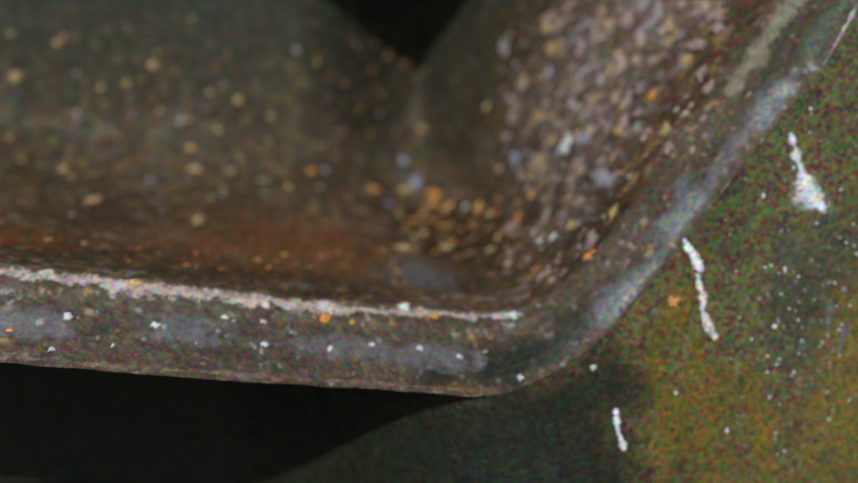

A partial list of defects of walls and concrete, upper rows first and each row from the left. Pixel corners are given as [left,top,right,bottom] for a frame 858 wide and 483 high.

corrosion [317,0,729,284]
efflorescence [788,132,828,213]
efflorescence [683,238,718,340]
corrosion [668,295,680,309]
corrosion [0,353,47,361]
corrosion [80,362,183,373]
corrosion [200,361,312,381]
corrosion [324,379,485,394]
water stain [407,364,638,483]